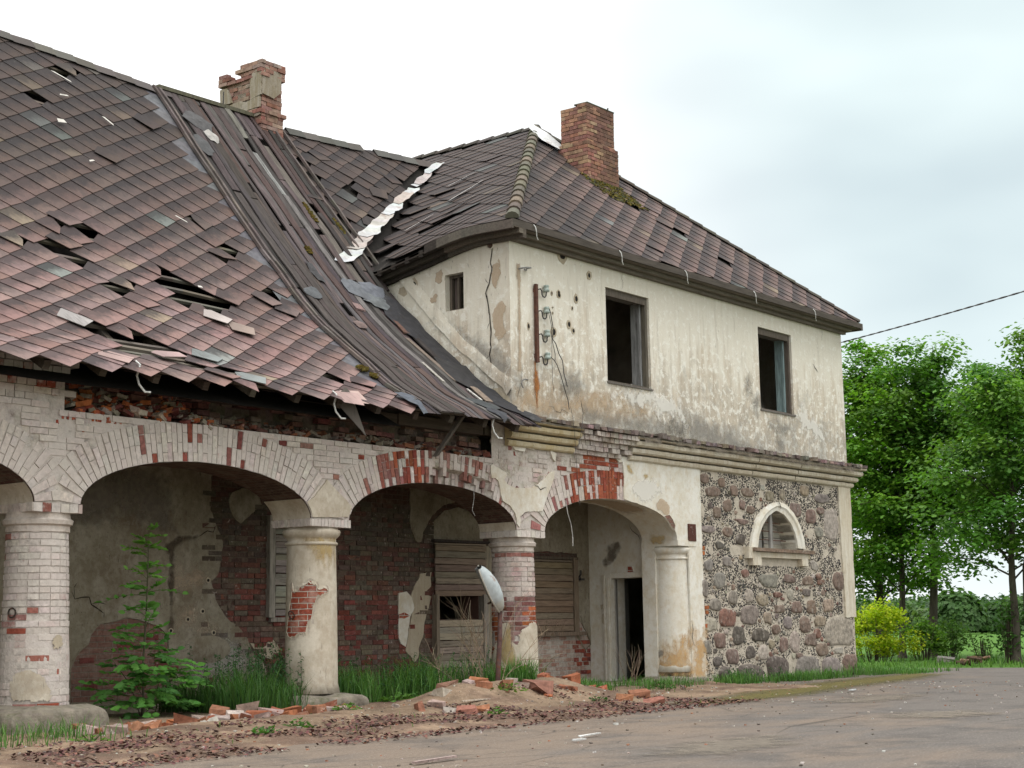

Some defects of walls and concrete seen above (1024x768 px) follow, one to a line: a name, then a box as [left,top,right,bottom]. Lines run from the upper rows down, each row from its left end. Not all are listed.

crack [485,247,493,363]
flaking render [492,301,506,340]
spalling [56,383,328,469]
flaking render [345,432,491,494]
spalling [547,455,632,511]
flaking render [7,607,38,634]
flaking render [12,617,179,706]
flaking render [286,578,329,640]
flaking render [491,597,591,681]